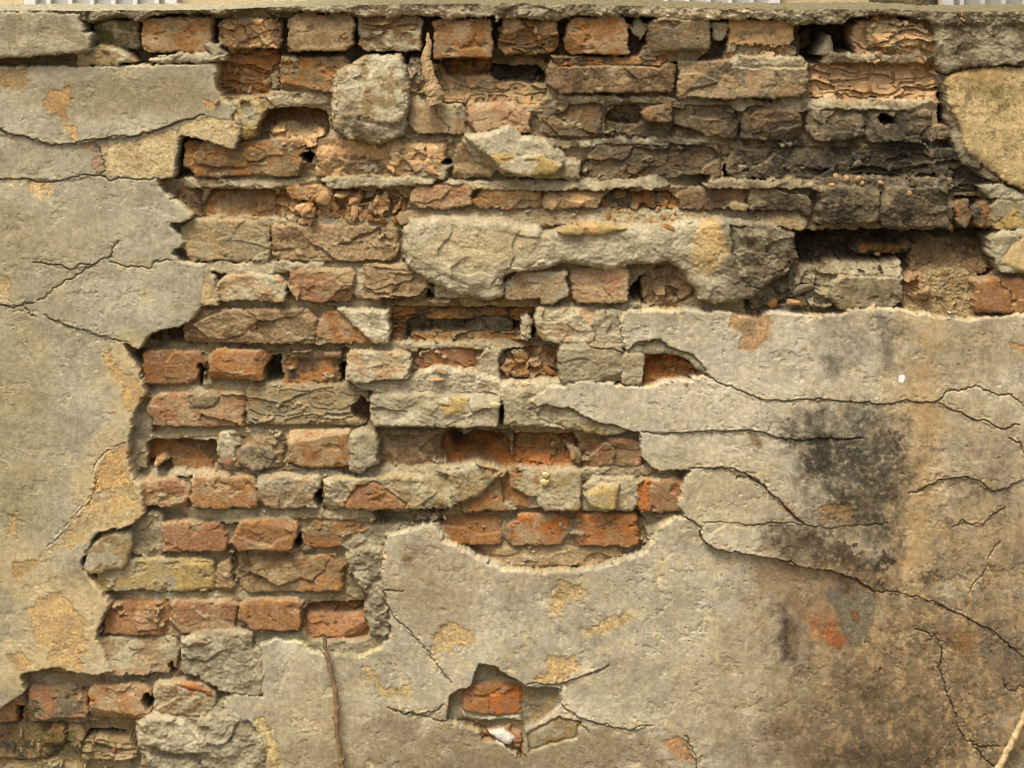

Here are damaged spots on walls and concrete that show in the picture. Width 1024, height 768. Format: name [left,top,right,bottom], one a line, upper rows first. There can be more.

peeling [44,16,330,177]
spalling [434,56,548,105]
spalling [808,15,939,105]
spalling [205,183,409,227]
spalling [599,188,677,230]
spalling [793,227,995,319]
spalling [391,305,559,380]
spalling [642,354,699,386]
spalling [149,438,235,472]
spalling [441,430,582,479]
leakage [768,406,906,585]
spalling [448,655,581,758]